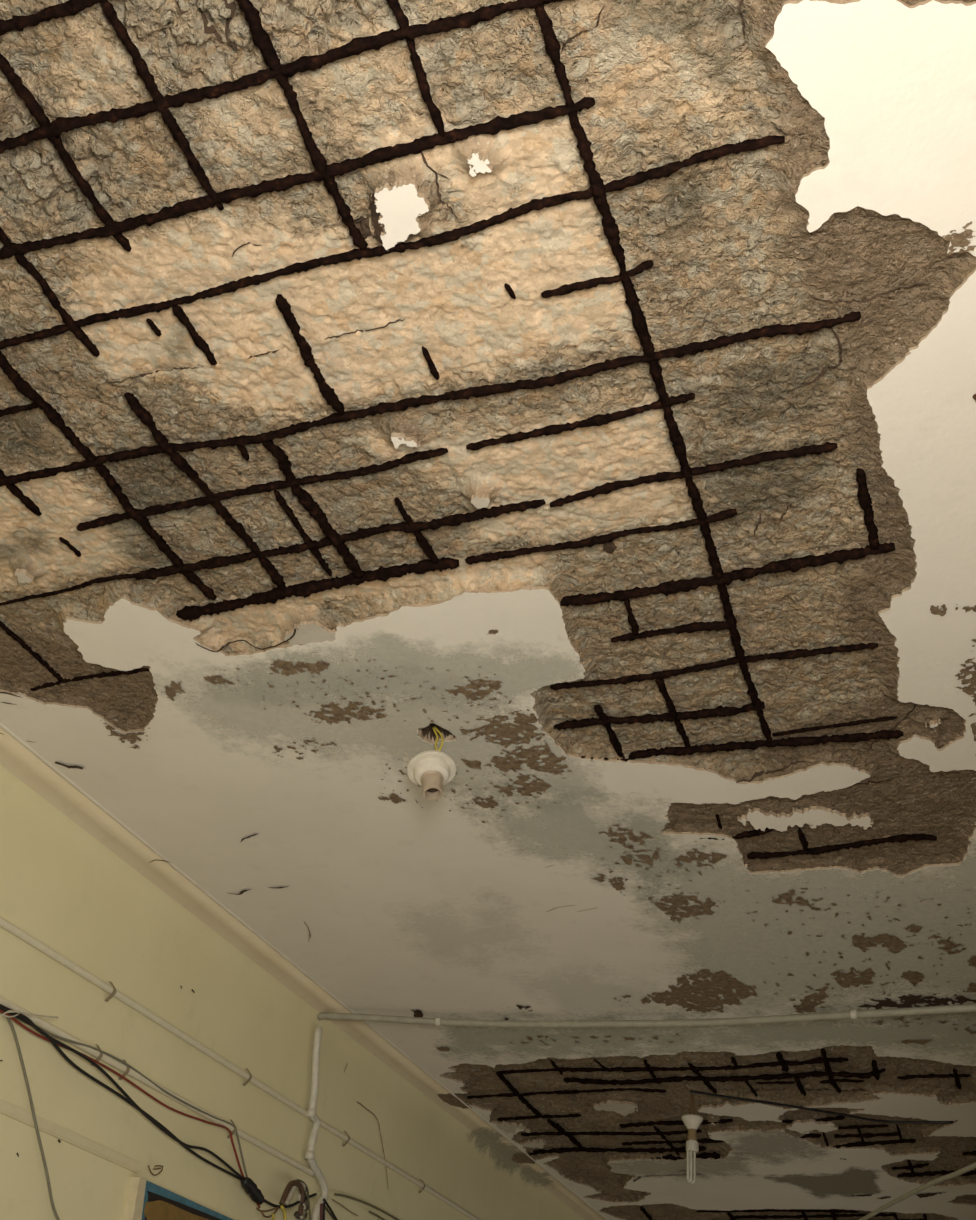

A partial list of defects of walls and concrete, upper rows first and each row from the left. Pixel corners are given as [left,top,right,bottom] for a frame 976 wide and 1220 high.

corrosion [0,0,904,762]
spalling [0,0,976,923]
corrosion [700,814,937,859]
spalling [437,1033,976,1220]
corrosion [467,1048,971,1161]
corrosion [696,1209,927,1220]
corrosion [891,1159,976,1177]